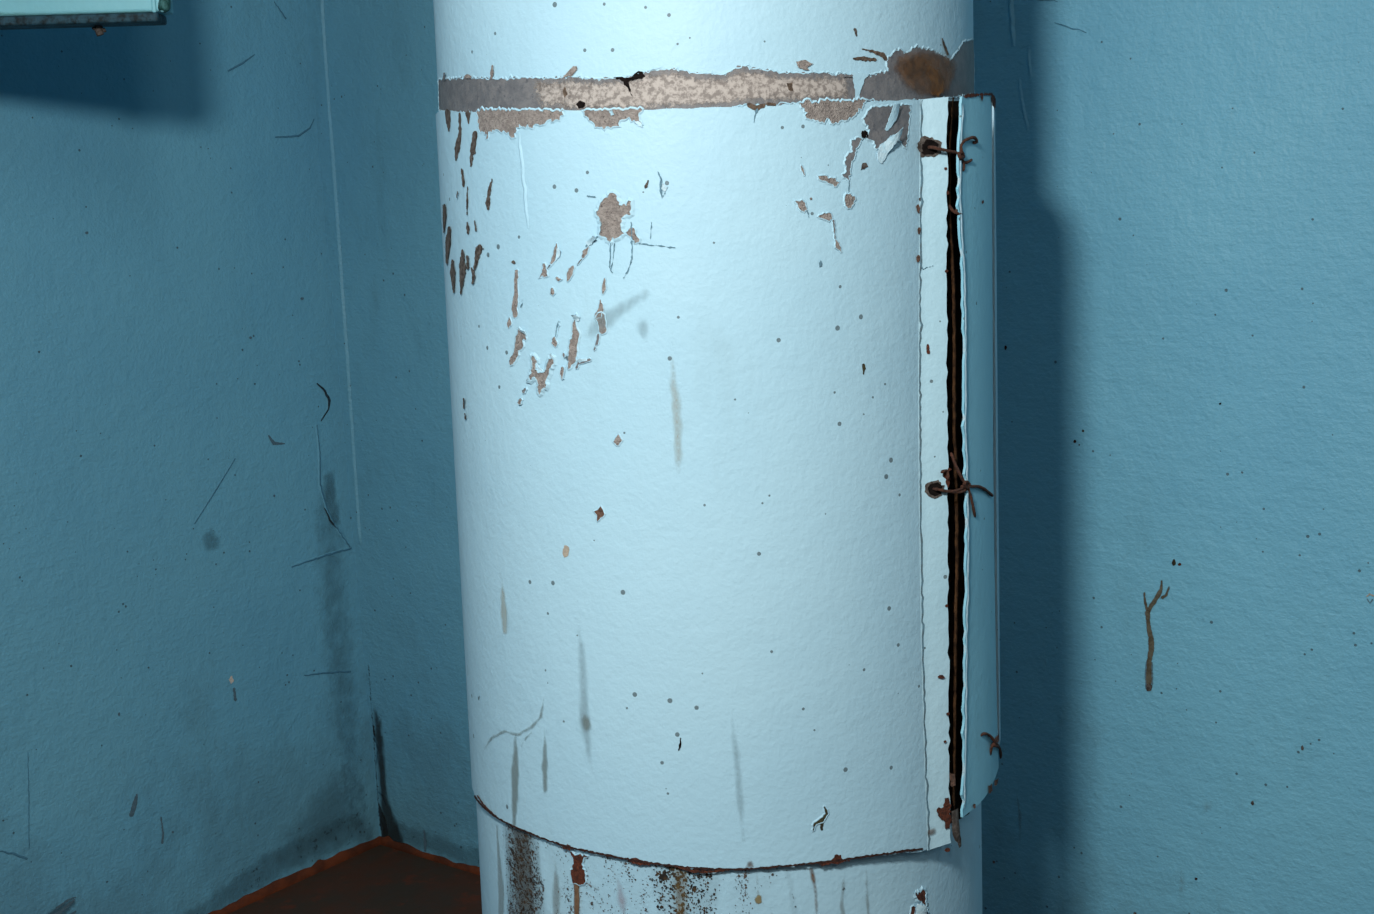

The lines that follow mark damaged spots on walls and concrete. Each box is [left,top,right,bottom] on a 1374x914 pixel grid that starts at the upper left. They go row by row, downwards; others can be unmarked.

peeling [438,28,975,810]
rust [474,52,996,914]
peeling [909,885,929,914]